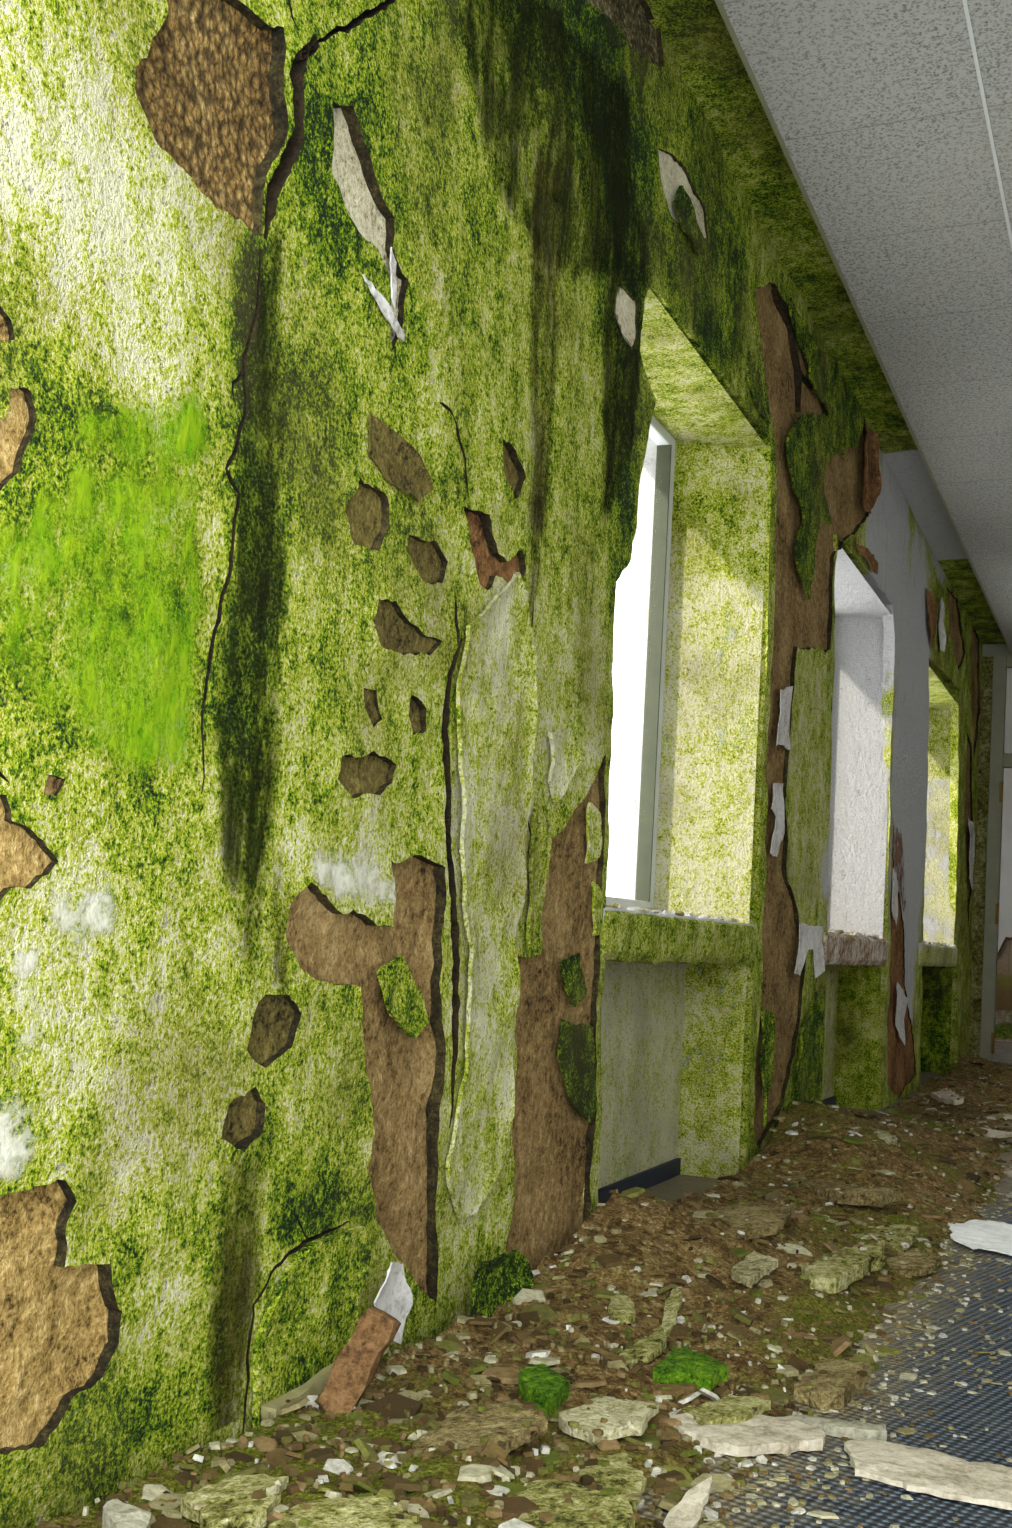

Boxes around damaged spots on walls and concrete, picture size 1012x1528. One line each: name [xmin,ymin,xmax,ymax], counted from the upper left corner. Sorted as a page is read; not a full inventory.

spalling [135,0,288,236]
spalling [0,387,36,490]
water stain [257,242,280,431]
peeling [345,414,434,551]
spalling [503,439,526,499]
water stain [219,450,282,950]
spalling [746,282,882,1149]
spalling [0,794,58,901]
peeling [286,507,606,1344]
crack [441,602,463,1128]
spalling [888,850,916,1098]
spalling [0,1179,122,1455]